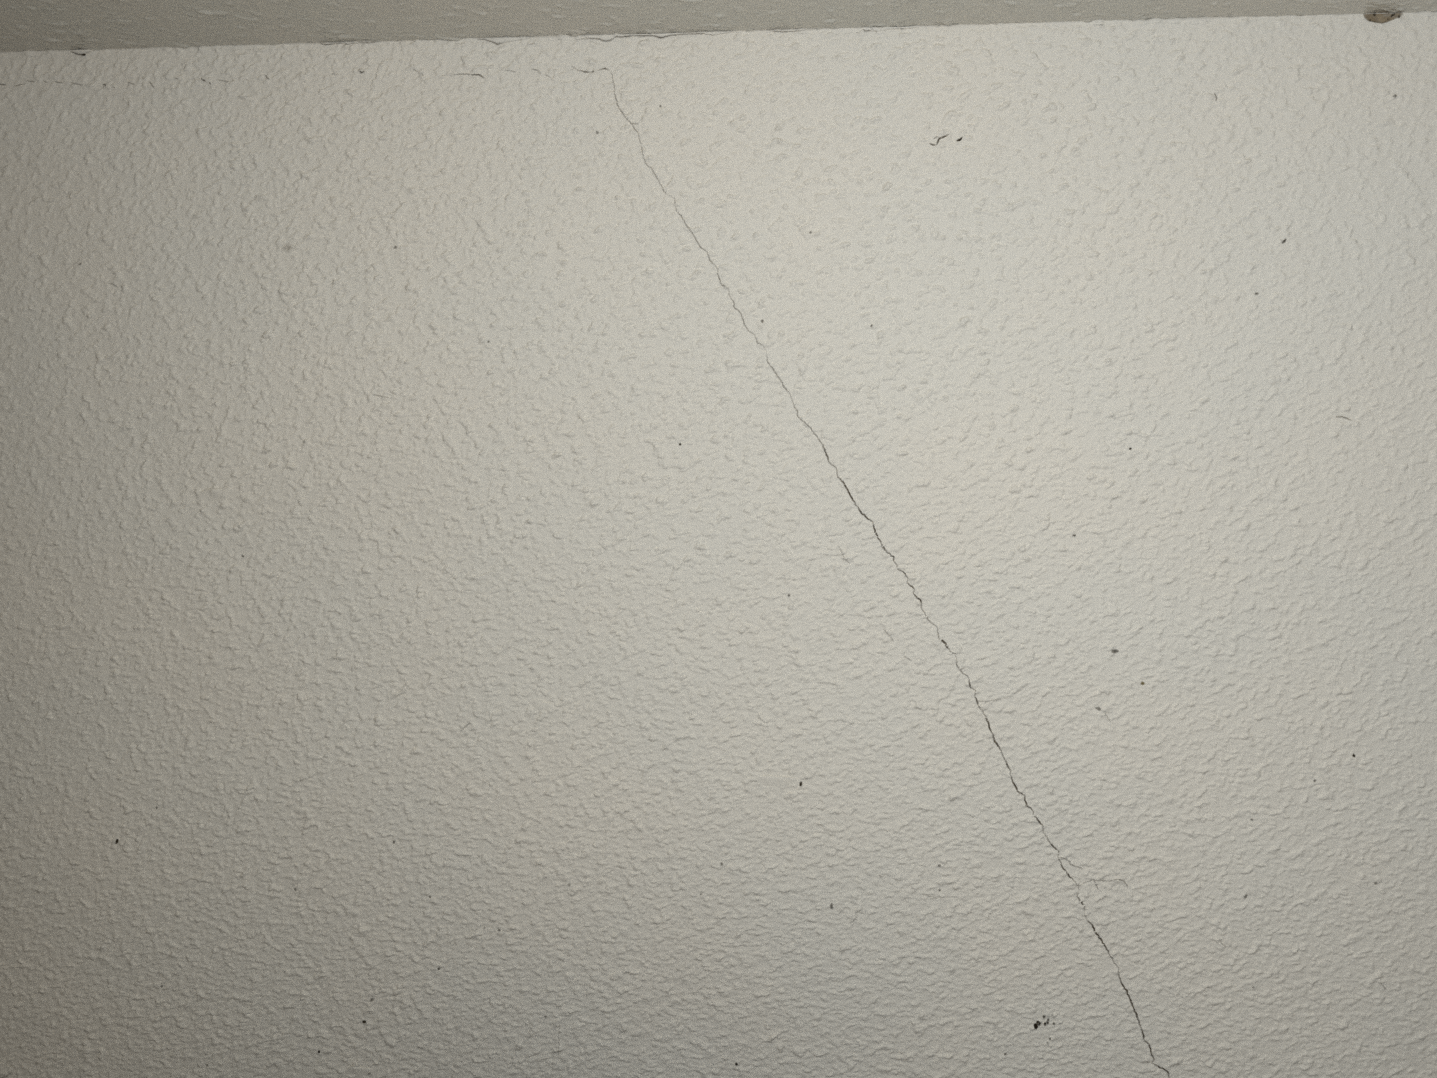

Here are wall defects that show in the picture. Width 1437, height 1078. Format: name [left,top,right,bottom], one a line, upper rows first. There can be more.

crack [824,449,922,603]
crack [969,682,1169,1073]